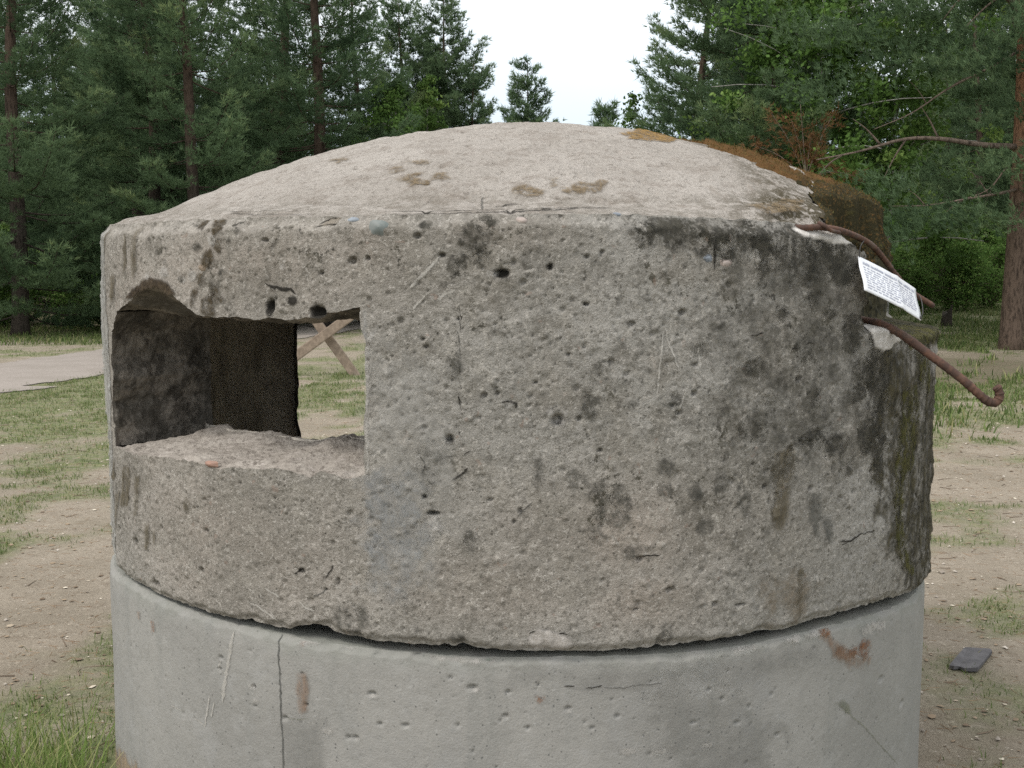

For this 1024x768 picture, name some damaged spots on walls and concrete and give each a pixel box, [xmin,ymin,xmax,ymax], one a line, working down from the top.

leakage [629,215,931,574]
leakage [568,469,631,539]
crack [276,636,284,766]